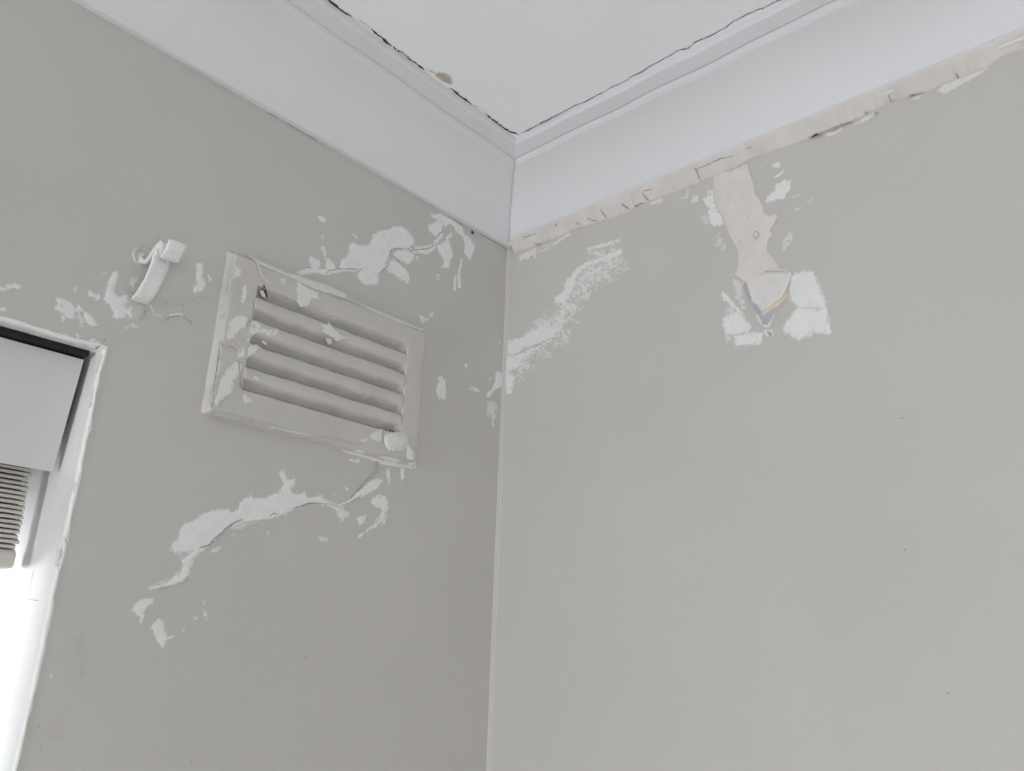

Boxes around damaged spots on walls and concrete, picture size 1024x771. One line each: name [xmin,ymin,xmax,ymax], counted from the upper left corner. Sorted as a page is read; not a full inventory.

crack [306,0,780,428]
peeling [712,164,792,337]
crack [144,431,418,592]